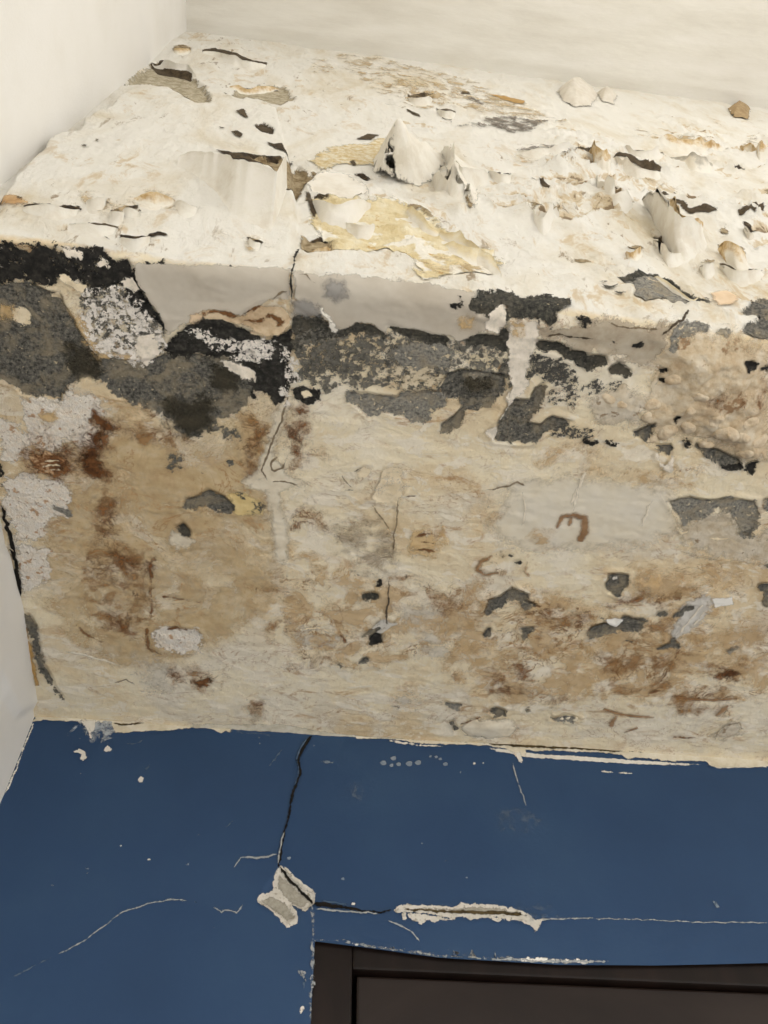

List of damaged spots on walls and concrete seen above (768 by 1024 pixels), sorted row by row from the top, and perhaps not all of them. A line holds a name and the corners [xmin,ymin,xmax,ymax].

spalling [124,45,267,103]
spalling [728,101,751,119]
peeling [176,85,375,252]
spalling [0,134,768,447]
corrosion [21,408,117,480]
damp [0,240,768,716]
spalling [633,424,760,476]
crack [234,735,312,867]
crack [15,898,185,976]
crack [314,900,419,940]
spalling [257,866,606,1018]
crack [543,916,767,924]